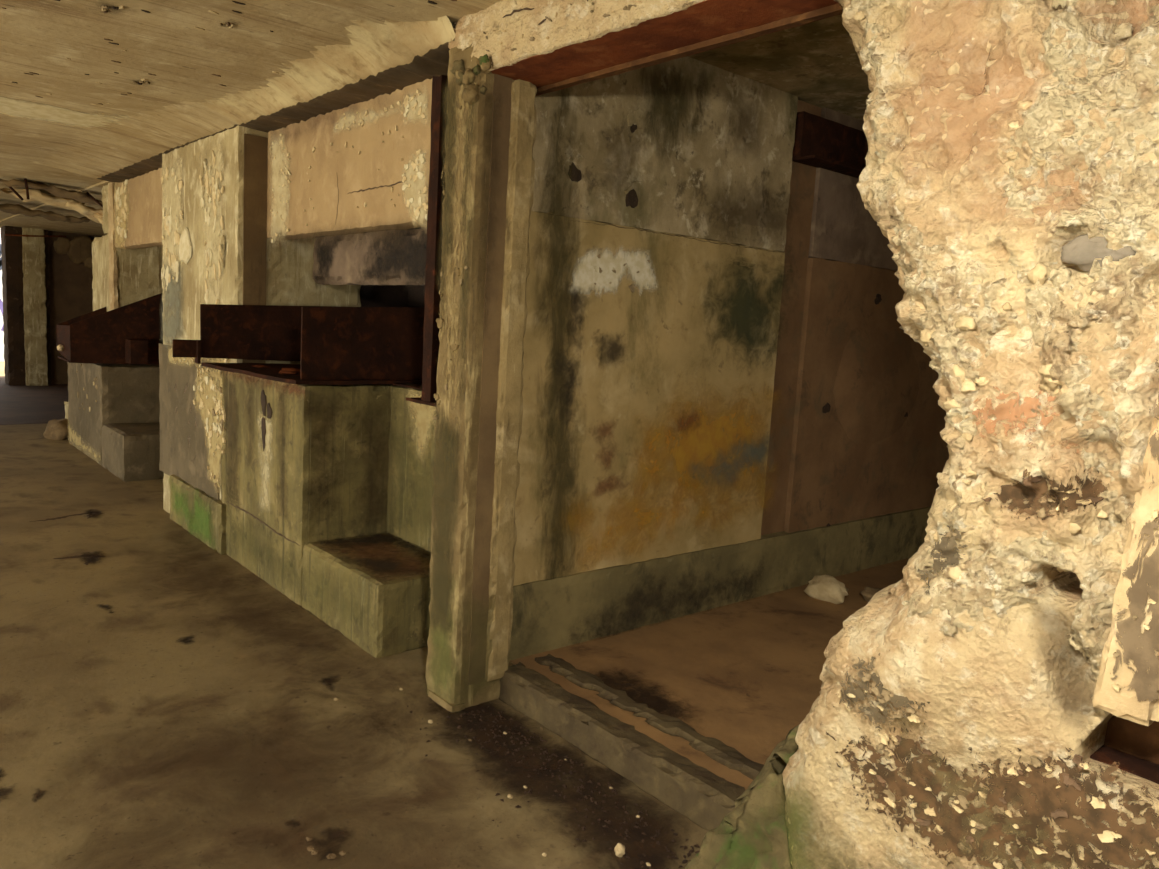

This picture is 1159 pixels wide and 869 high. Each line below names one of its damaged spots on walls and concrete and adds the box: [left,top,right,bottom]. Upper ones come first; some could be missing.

crack [502,7,546,25]
peeling [161,150,226,304]
leakage [315,238,339,285]
leakage [364,230,427,287]
leakage [600,336,624,361]
leakage [707,261,784,362]
spalling [851,0,1159,714]
flaking render [168,348,229,493]
peeling [826,644,1159,869]